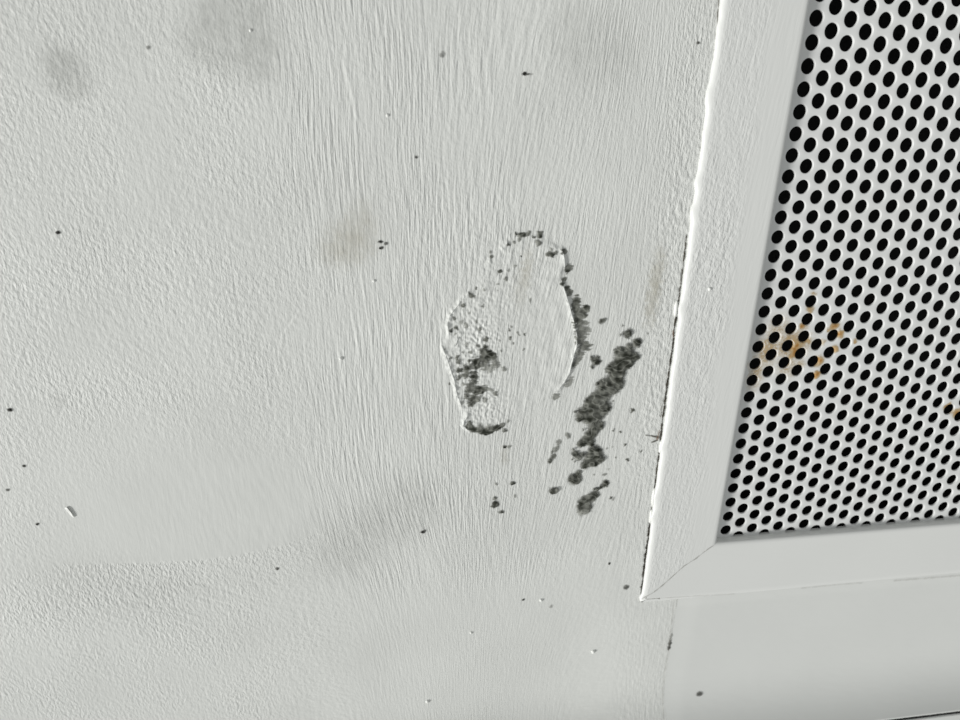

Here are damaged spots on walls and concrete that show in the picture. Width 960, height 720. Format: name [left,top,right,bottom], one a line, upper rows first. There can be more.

water stain [507,231,642,515]
corrosion [753,323,811,377]
corrosion [824,323,857,353]